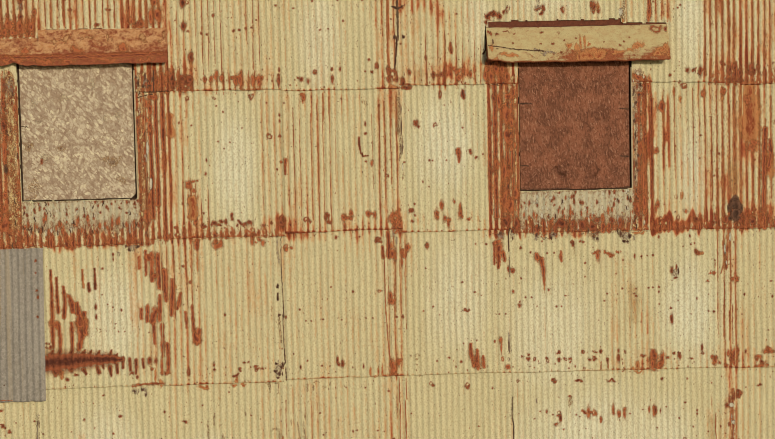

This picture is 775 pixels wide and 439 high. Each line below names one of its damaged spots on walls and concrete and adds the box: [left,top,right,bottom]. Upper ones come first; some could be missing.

corrosion [0,0,284,395]
corrosion [262,0,775,373]
corrosion [600,343,695,380]